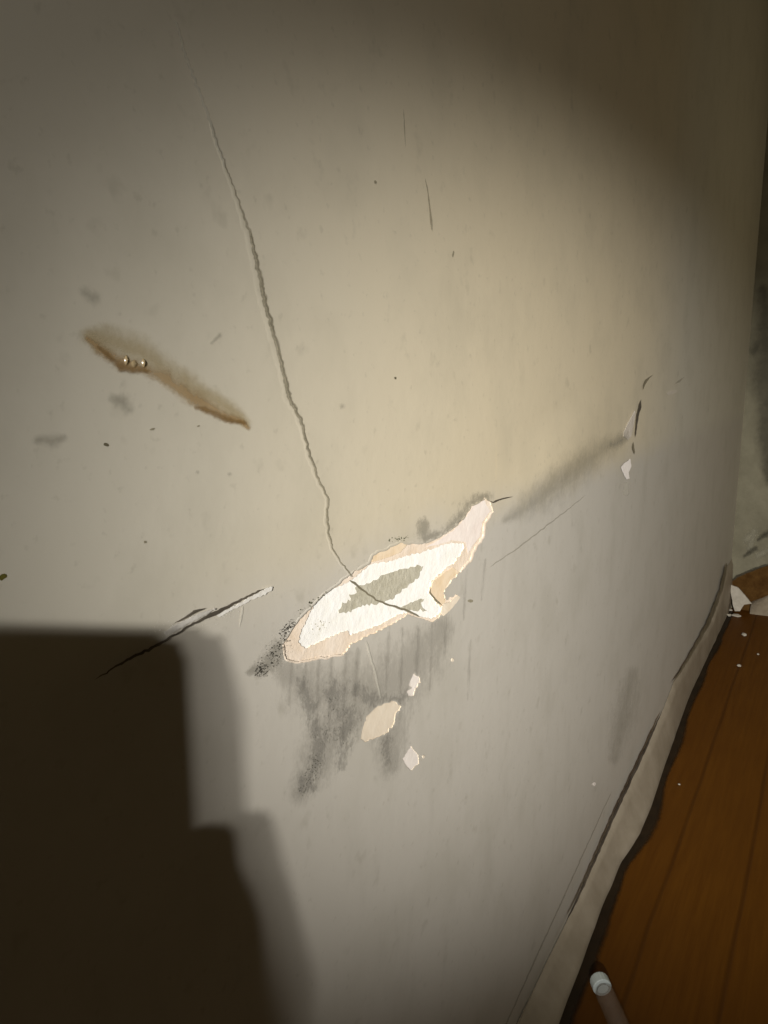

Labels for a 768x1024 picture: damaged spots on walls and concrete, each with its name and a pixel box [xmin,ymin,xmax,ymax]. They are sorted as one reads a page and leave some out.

crack [175,21,352,577]
corrosion [86,337,249,429]
spalling [621,459,631,479]
peeling [282,498,493,664]
crack [96,587,273,679]
damp [255,591,326,677]
peeling [360,701,400,742]
peeling [407,674,420,696]
peeling [403,746,425,770]